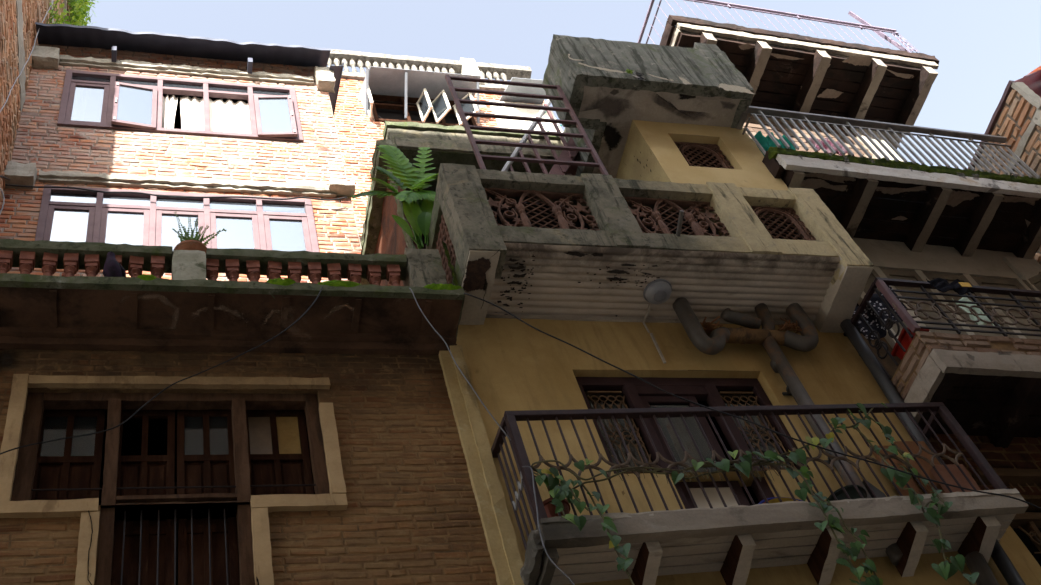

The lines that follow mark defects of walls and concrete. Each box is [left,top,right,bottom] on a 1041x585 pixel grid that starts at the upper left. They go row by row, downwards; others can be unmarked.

spalling [463,256,535,315]
crack [86,511,94,585]